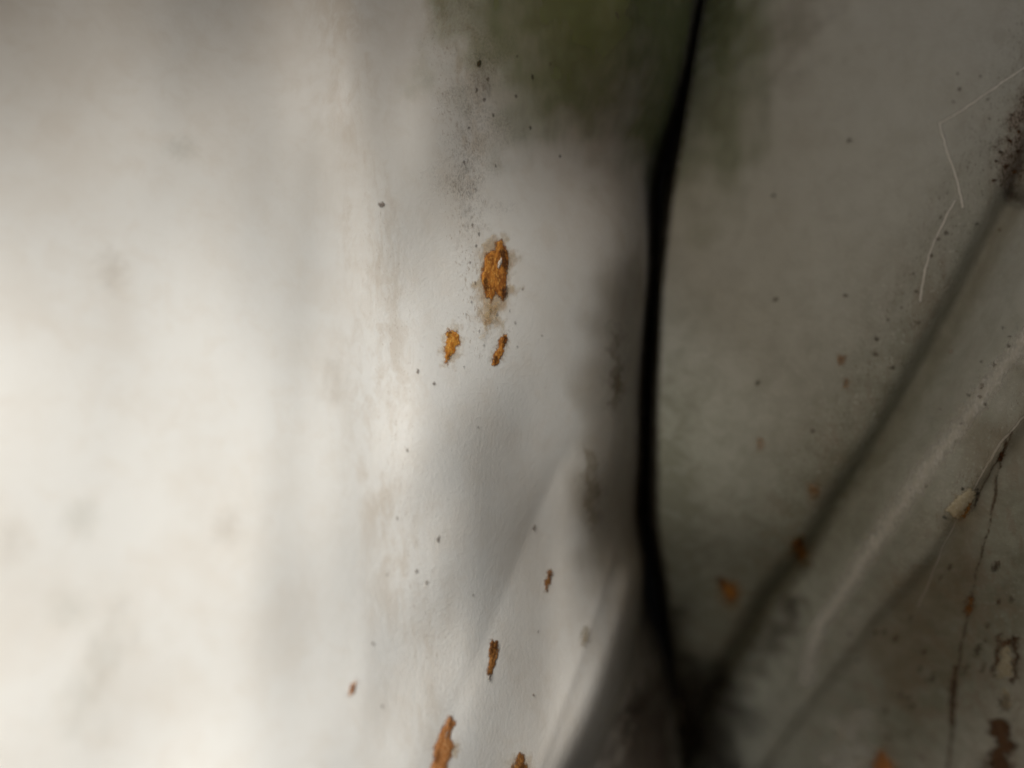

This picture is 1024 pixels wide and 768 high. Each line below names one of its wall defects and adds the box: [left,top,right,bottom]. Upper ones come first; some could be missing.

rust [481,239,509,301]
rust [445,330,460,363]
rust [492,334,507,366]
peeling [800,328,1024,685]
crack [947,433,1012,767]
rust [487,640,499,679]
rust [430,716,456,768]
rust [511,752,528,768]
rust [988,719,1017,768]